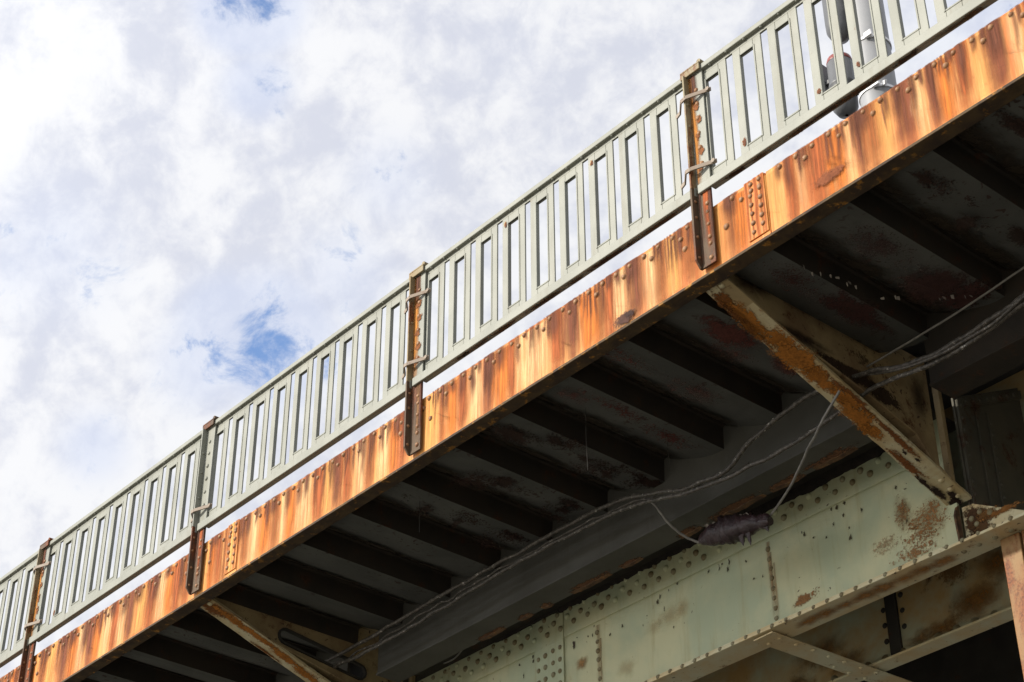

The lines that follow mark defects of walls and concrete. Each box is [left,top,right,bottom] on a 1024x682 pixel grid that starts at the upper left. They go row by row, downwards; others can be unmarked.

corrosion [944,7,983,34]
corrosion [776,18,1008,219]
corrosion [0,75,766,682]
corrosion [706,286,926,482]
corrosion [676,446,858,539]
corrosion [795,587,820,606]
corrosion [800,496,994,642]
corrosion [963,502,1020,537]
corrosion [985,550,1005,574]
corrosion [817,641,860,662]